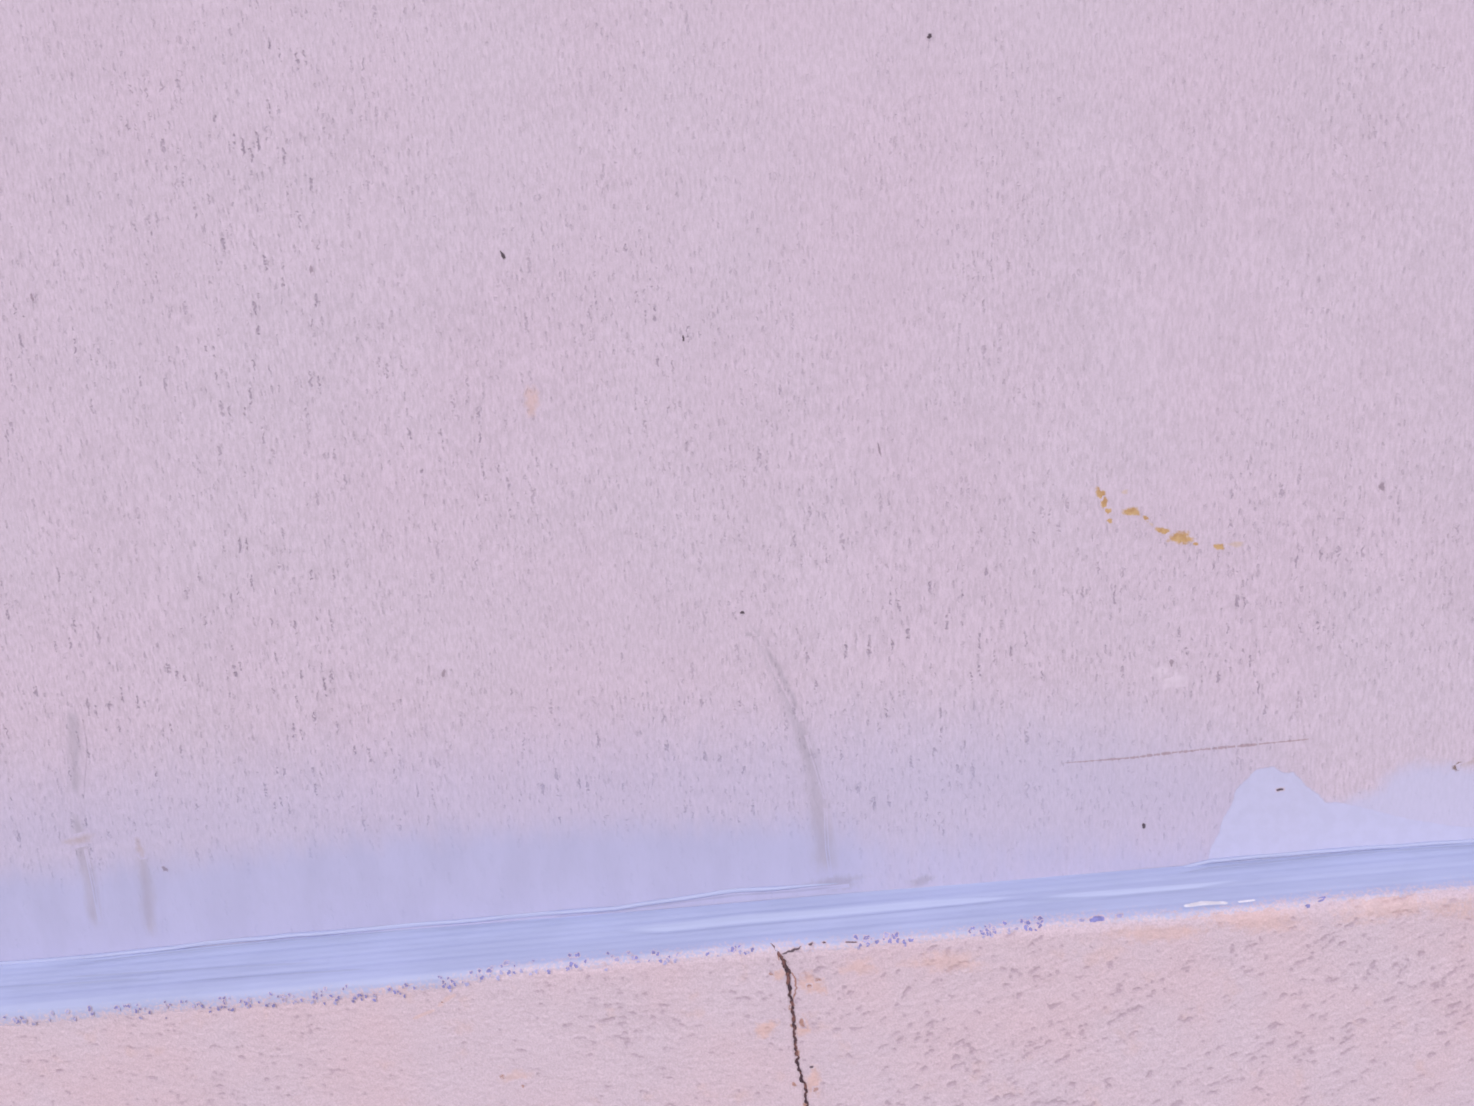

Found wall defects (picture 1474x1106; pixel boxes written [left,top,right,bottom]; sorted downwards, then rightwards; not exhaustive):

crack [770,941,858,1106]